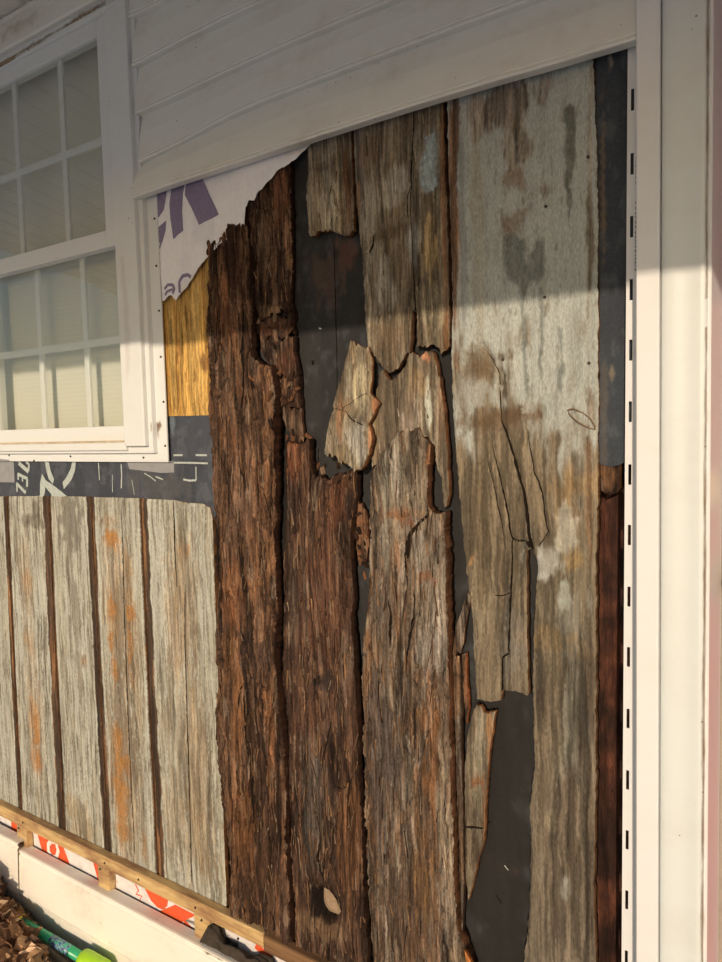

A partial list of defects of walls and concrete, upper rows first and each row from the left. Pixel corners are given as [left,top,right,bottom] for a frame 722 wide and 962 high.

leakage [503,234,544,293]
crack [487,352,549,691]